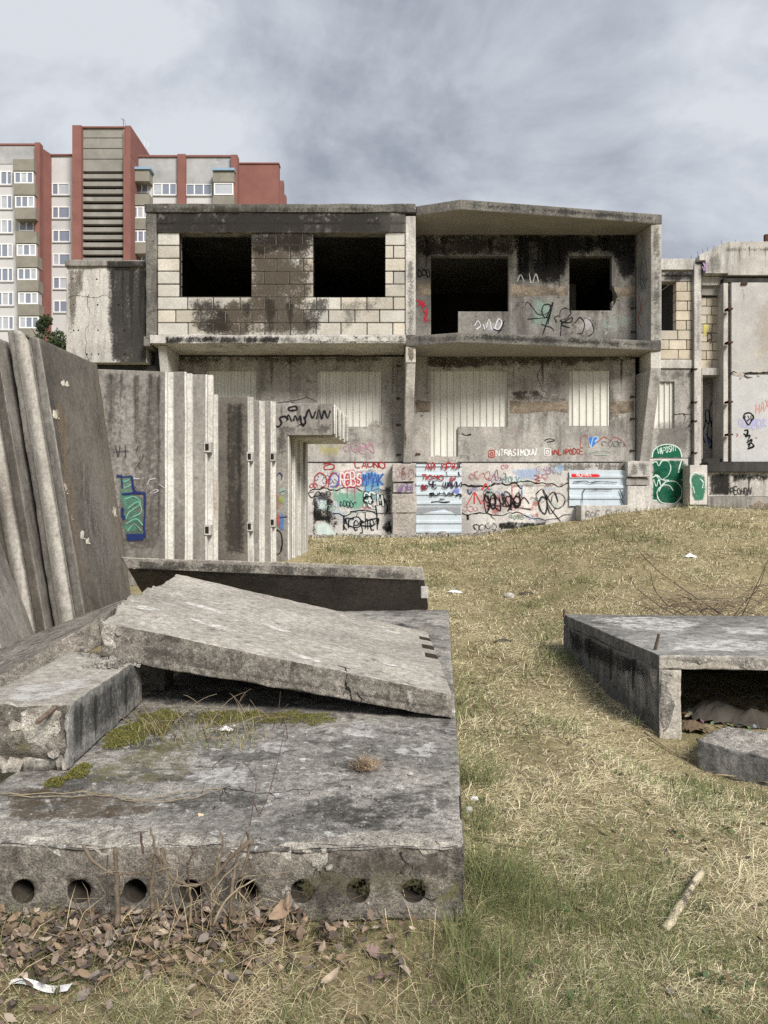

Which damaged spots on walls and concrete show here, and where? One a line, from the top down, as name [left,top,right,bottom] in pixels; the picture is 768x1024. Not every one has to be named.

leakage [69,269,144,346]
crack [340,666,365,702]
spalling [8,705,61,759]